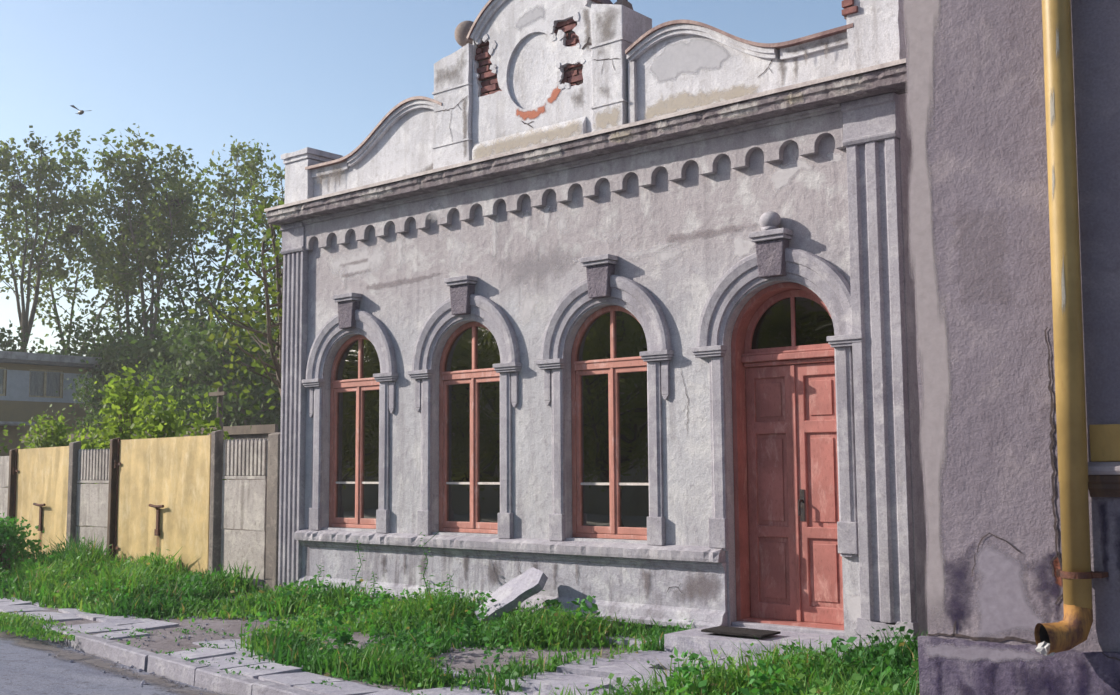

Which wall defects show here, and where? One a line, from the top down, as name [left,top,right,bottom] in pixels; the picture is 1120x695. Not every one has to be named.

spalling [841,0,858,20]
flaking render [474,34,502,97]
flaking render [516,12,585,120]
crack [1044,327,1063,605]
crack [972,533,1021,574]
damp [1100,504,1120,572]
damp [686,576,717,597]
damp [950,565,966,629]
damp [927,644,1062,695]
damp [1078,661,1088,695]